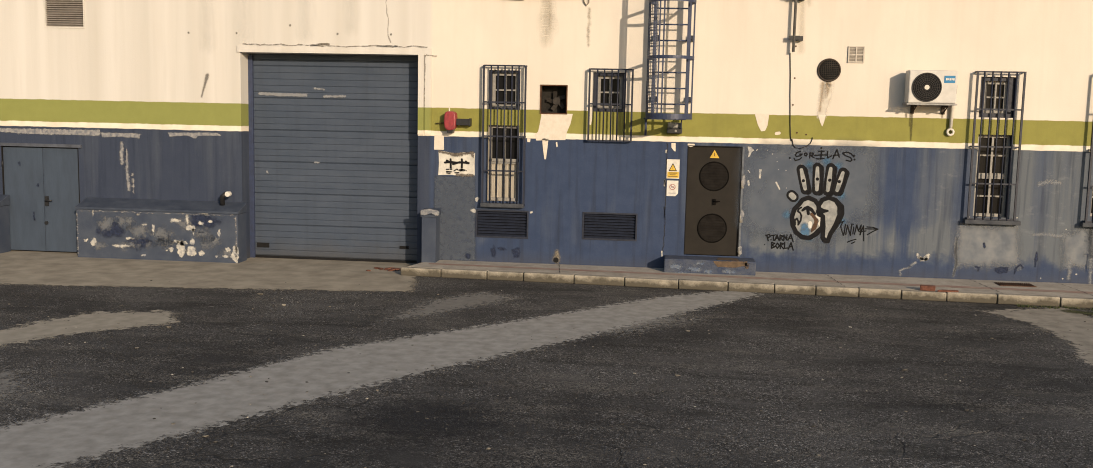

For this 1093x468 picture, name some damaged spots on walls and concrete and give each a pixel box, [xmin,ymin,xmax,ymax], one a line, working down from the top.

damp [818,85,832,117]
peeling [527,114,573,159]
peeling [755,114,781,135]
peeling [166,213,239,263]